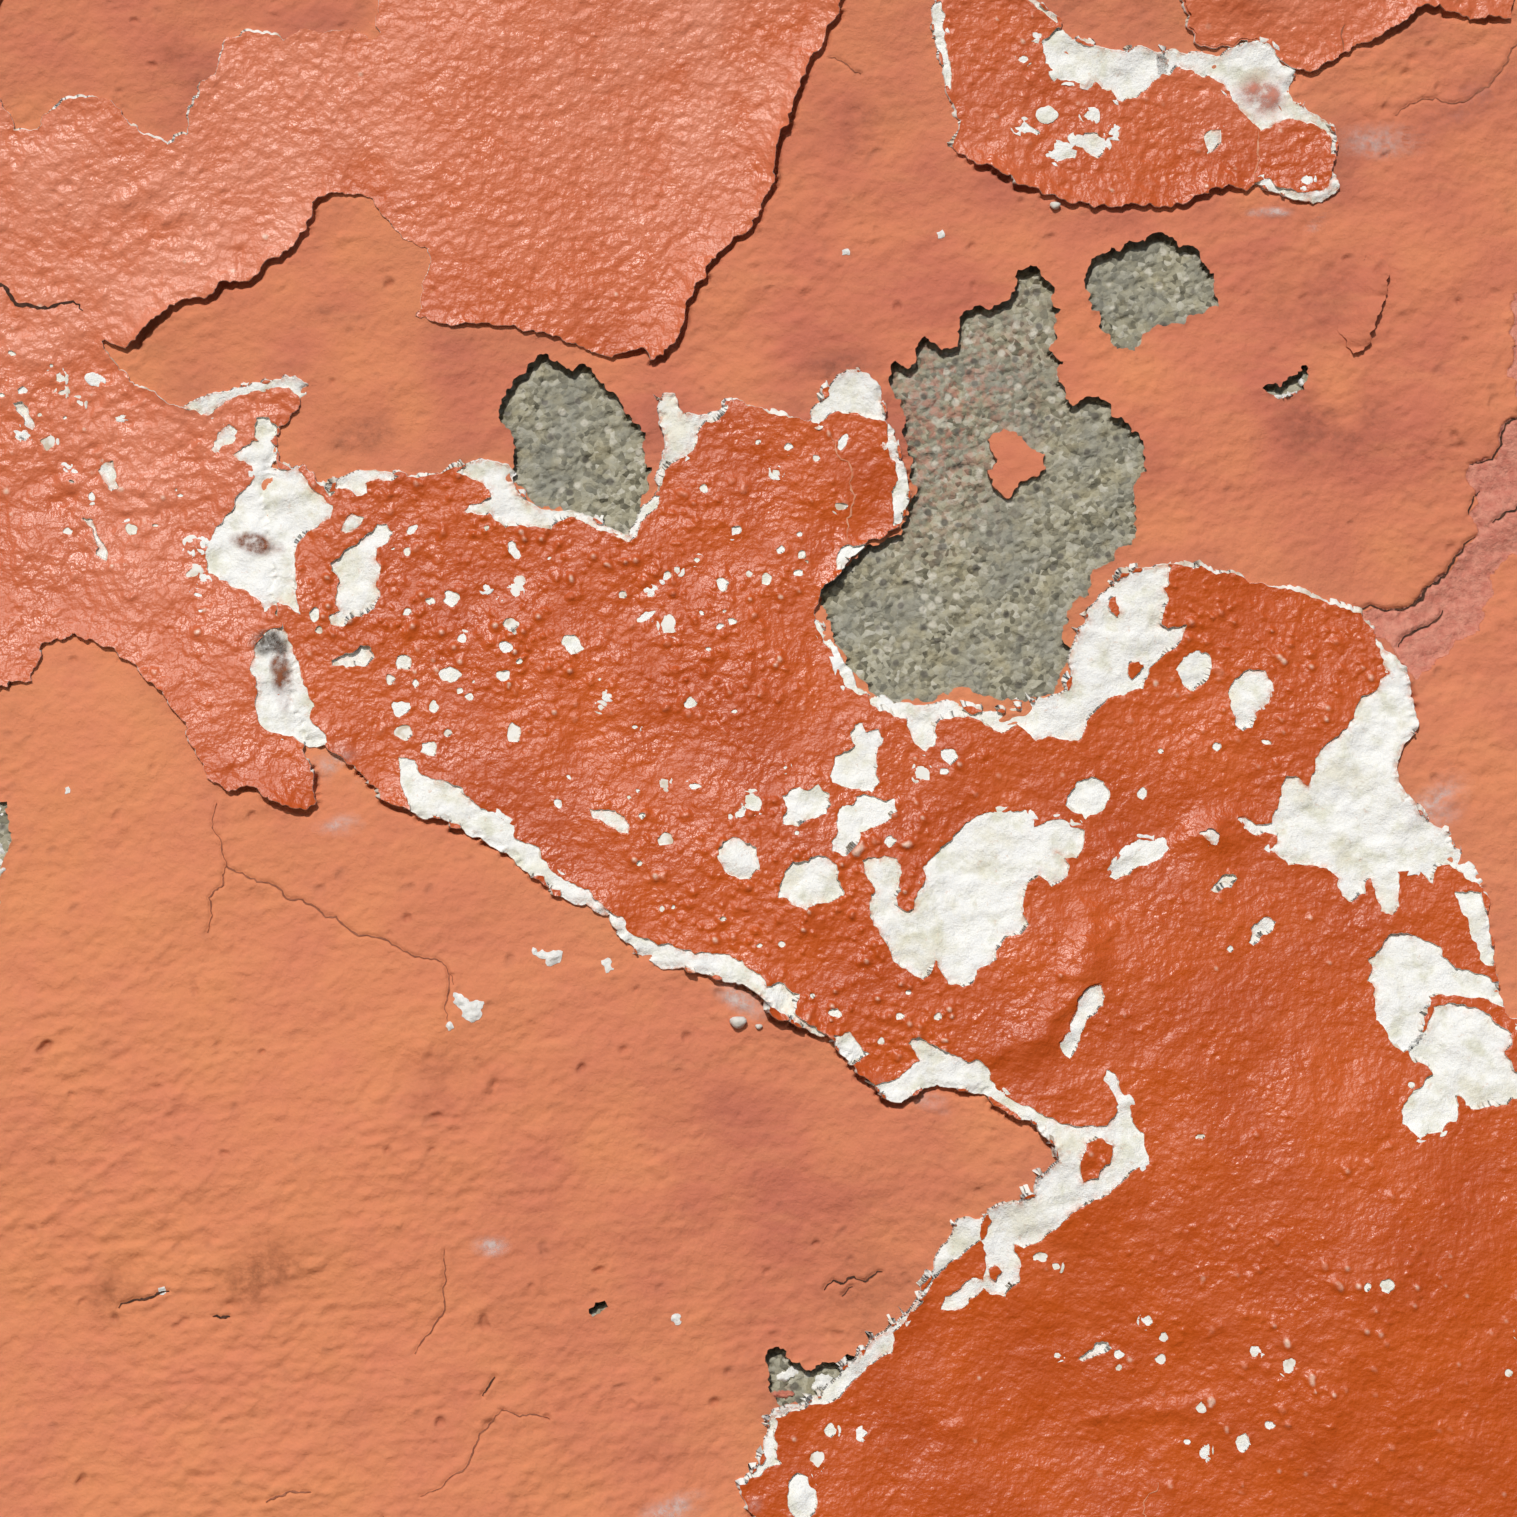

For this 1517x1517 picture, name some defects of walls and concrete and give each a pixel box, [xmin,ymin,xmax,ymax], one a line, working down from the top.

peeling [930,0,1514,208]
crack [0,283,83,311]
spalling [1084,232,1219,351]
spalling [1263,365,1309,399]
peeling [1199,828,1220,846]
peeling [1417,992,1517,1072]
spalling [589,1301,608,1317]
peeling [1283,1358,1295,1373]
peeling [856,1426,867,1442]
peeling [1236,1433,1250,1452]
peeling [810,1451,824,1467]
peeling [1199,1444,1211,1463]